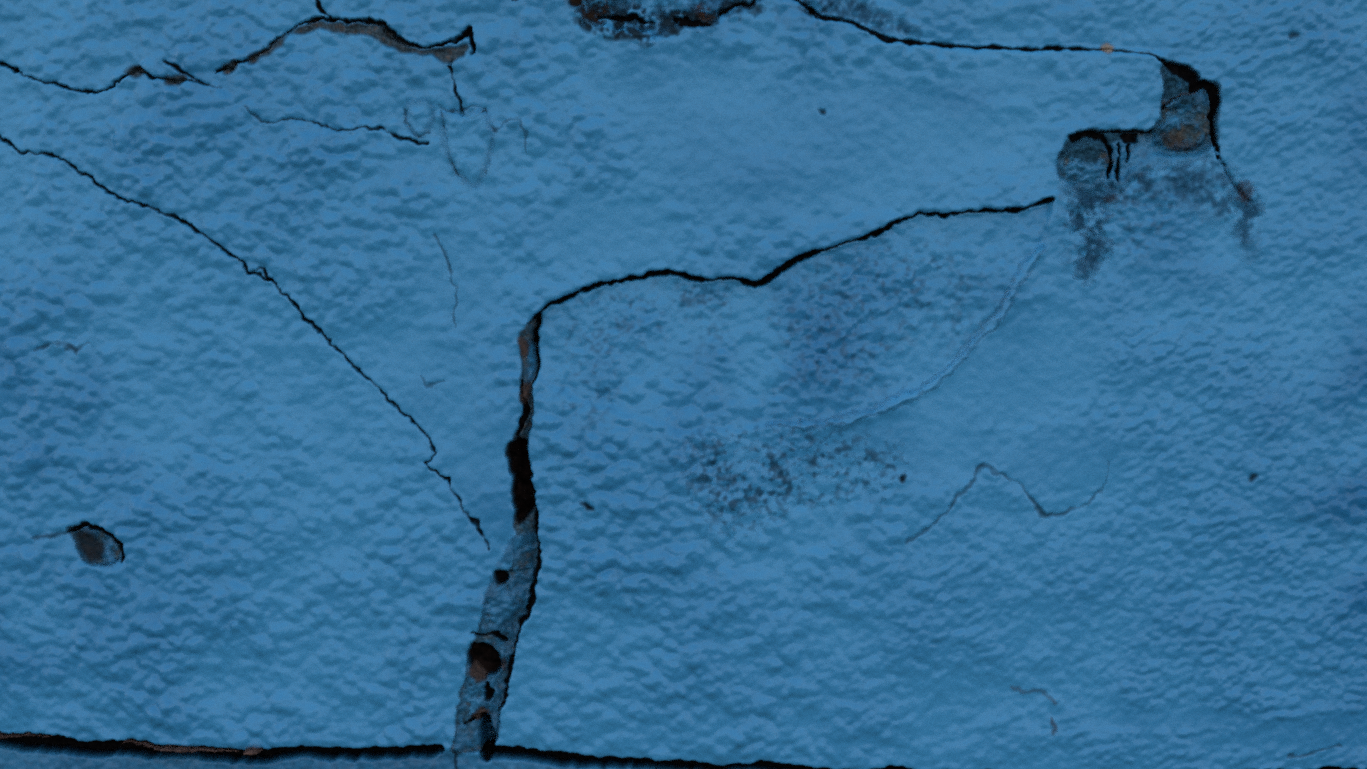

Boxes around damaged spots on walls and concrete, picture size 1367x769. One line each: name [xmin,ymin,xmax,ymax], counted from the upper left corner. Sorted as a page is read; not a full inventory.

crack [0,0,476,112]
spalling [570,0,760,40]
crack [808,0,1167,64]
crack [267,118,429,145]
spalling [1058,63,1220,187]
crack [529,197,1054,323]
crack [0,136,490,550]
spalling [69,522,125,565]
spalling [451,316,541,753]
crack [0,714,830,769]
crack [873,761,911,769]
crack [1319,761,1357,769]